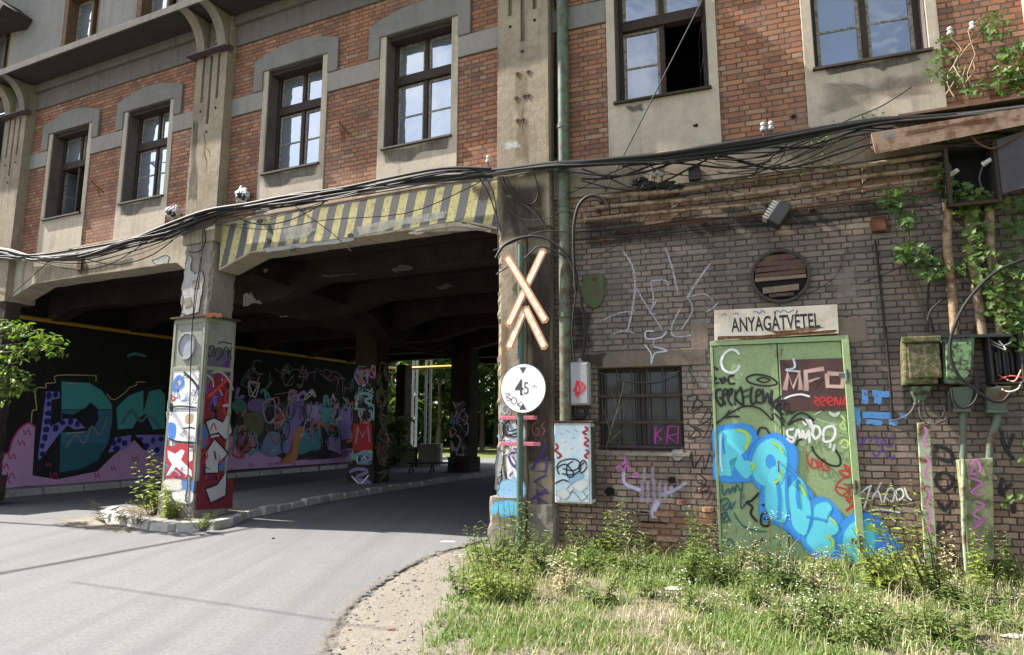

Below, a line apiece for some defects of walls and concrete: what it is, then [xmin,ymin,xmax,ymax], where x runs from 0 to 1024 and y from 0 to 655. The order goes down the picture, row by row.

corrosion [908,117,995,135]
flaking render [181,255,204,315]
peeling [243,292,262,306]
corrosion [718,326,837,340]